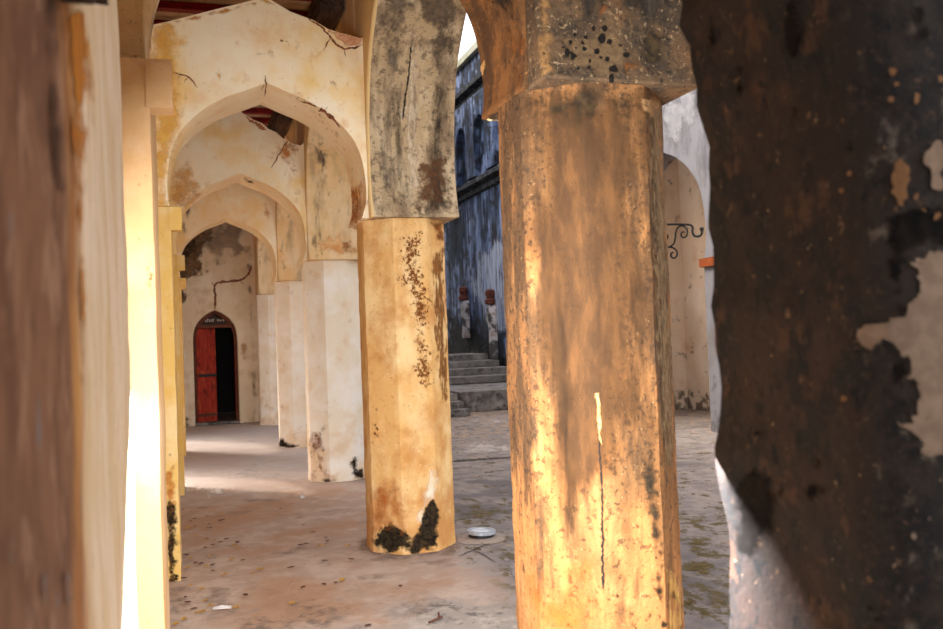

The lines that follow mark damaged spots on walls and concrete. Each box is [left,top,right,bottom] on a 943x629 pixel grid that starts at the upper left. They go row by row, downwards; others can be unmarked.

crack [308,18,362,56]
water stain [414,150,450,213]
peeling [891,158,941,220]
peeling [923,140,943,191]
crack [212,265,252,310]
peeling [856,250,943,460]
water stain [166,472,179,582]
water stain [372,500,439,554]
peeling [425,471,438,498]
crack [597,441,605,588]